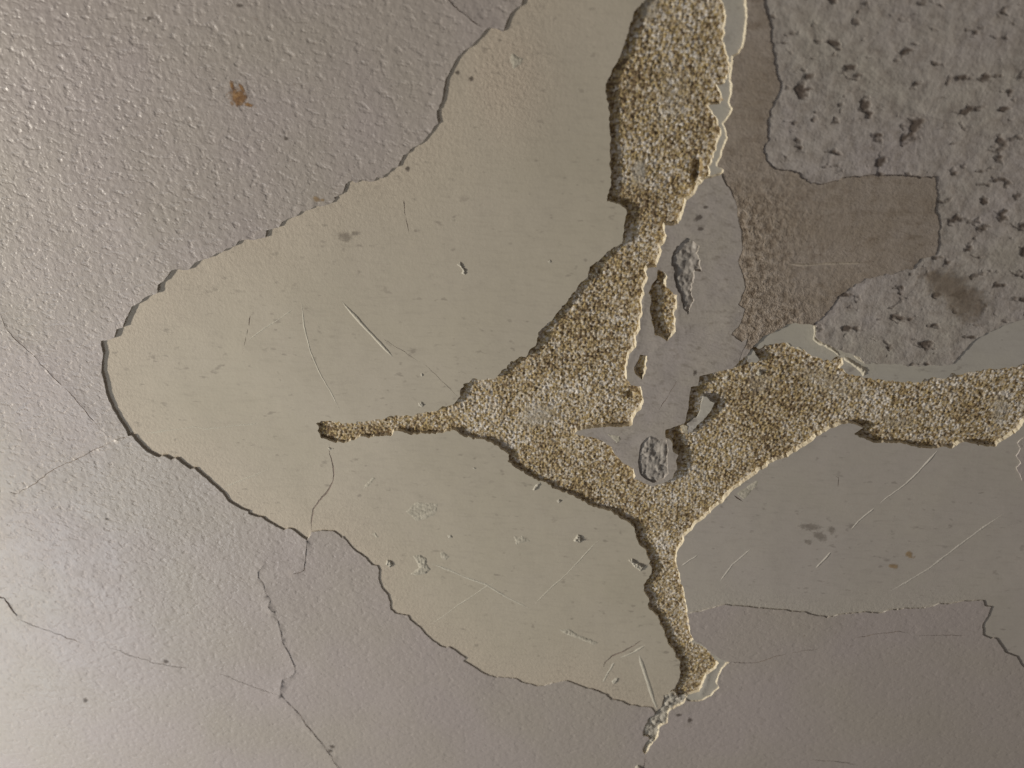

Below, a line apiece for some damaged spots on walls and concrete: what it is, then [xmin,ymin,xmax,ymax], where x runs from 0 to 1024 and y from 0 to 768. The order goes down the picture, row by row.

corrosion [230,81,252,107]
peeling [101,0,680,712]
flaking render [316,0,1024,754]
crack [0,597,83,644]
crack [218,570,338,767]